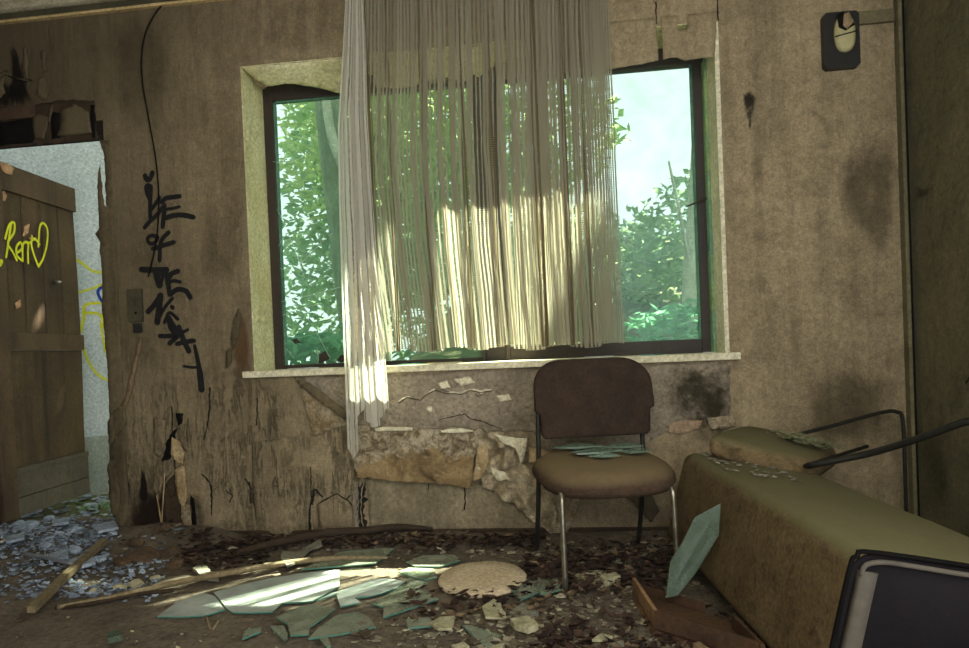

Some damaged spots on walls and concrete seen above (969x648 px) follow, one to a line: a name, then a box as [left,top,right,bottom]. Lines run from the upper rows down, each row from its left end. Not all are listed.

peeling [0,47,92,140]
crack [398,388,502,429]
flaking render [303,362,737,451]
leakage [678,377,725,433]
flaking render [153,413,197,525]
peeling [366,477,542,529]